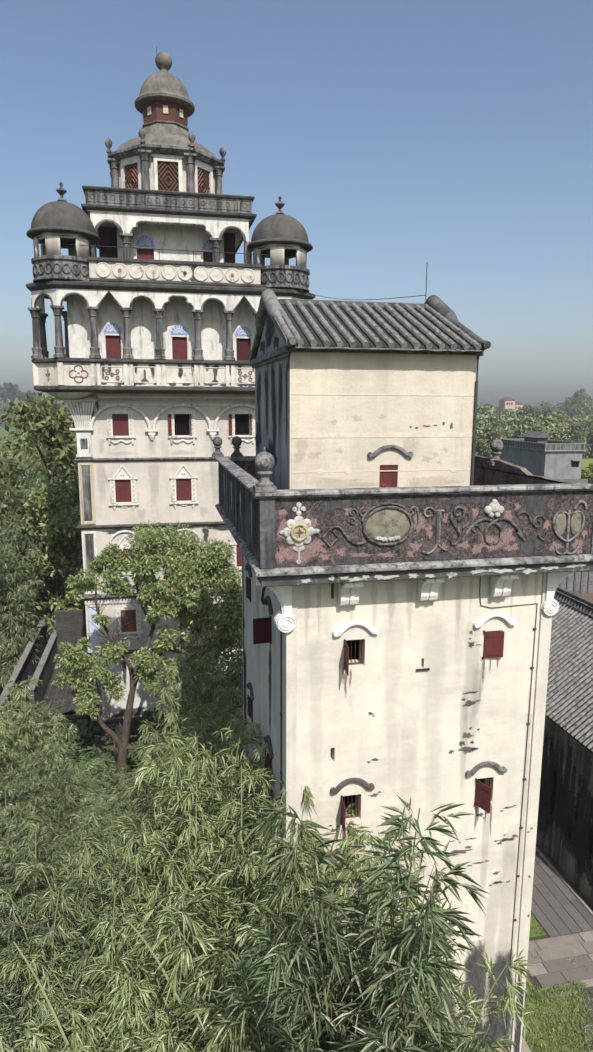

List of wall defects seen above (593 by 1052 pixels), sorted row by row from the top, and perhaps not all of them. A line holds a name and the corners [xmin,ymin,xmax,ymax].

water stain [329,557,435,581]
water stain [425,552,452,561]
water stain [470,536,586,574]
spalling [448,726,480,754]
water stain [537,733,593,885]